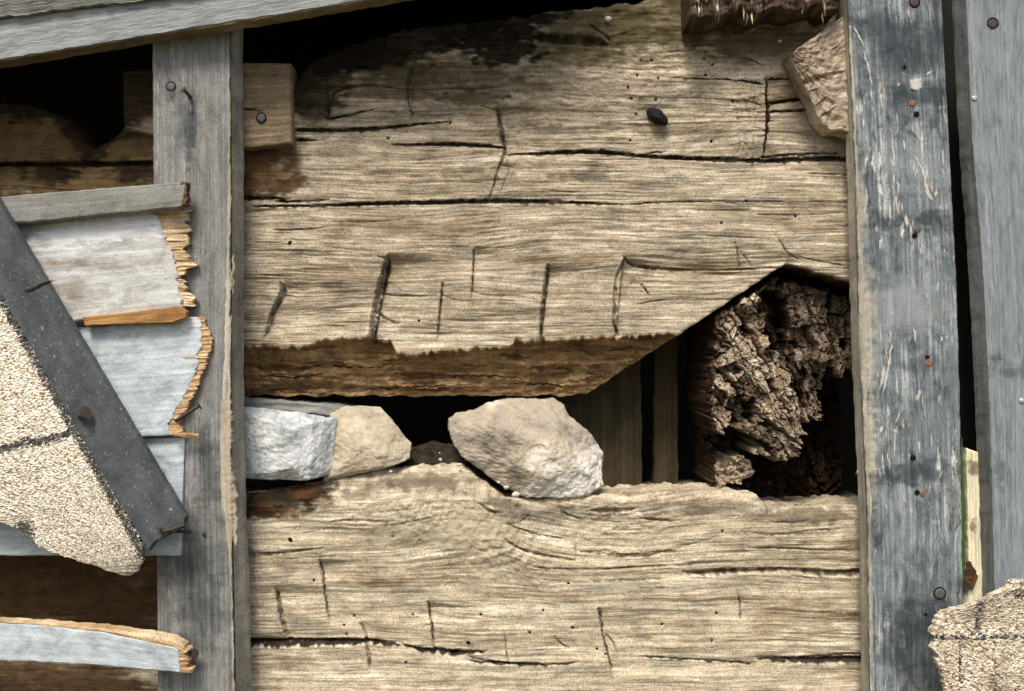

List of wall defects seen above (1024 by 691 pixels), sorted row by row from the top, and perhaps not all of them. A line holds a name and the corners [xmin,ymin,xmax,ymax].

damp [294,0,815,126]
crack [245,42,846,243]
peeling [27,212,162,257]
peeling [180,317,201,332]
crack [371,263,390,337]
crack [540,270,548,332]
crack [611,286,619,331]
crack [625,245,790,304]
crack [263,548,328,610]
crack [250,591,575,666]
crack [599,612,611,664]
crack [642,652,861,664]